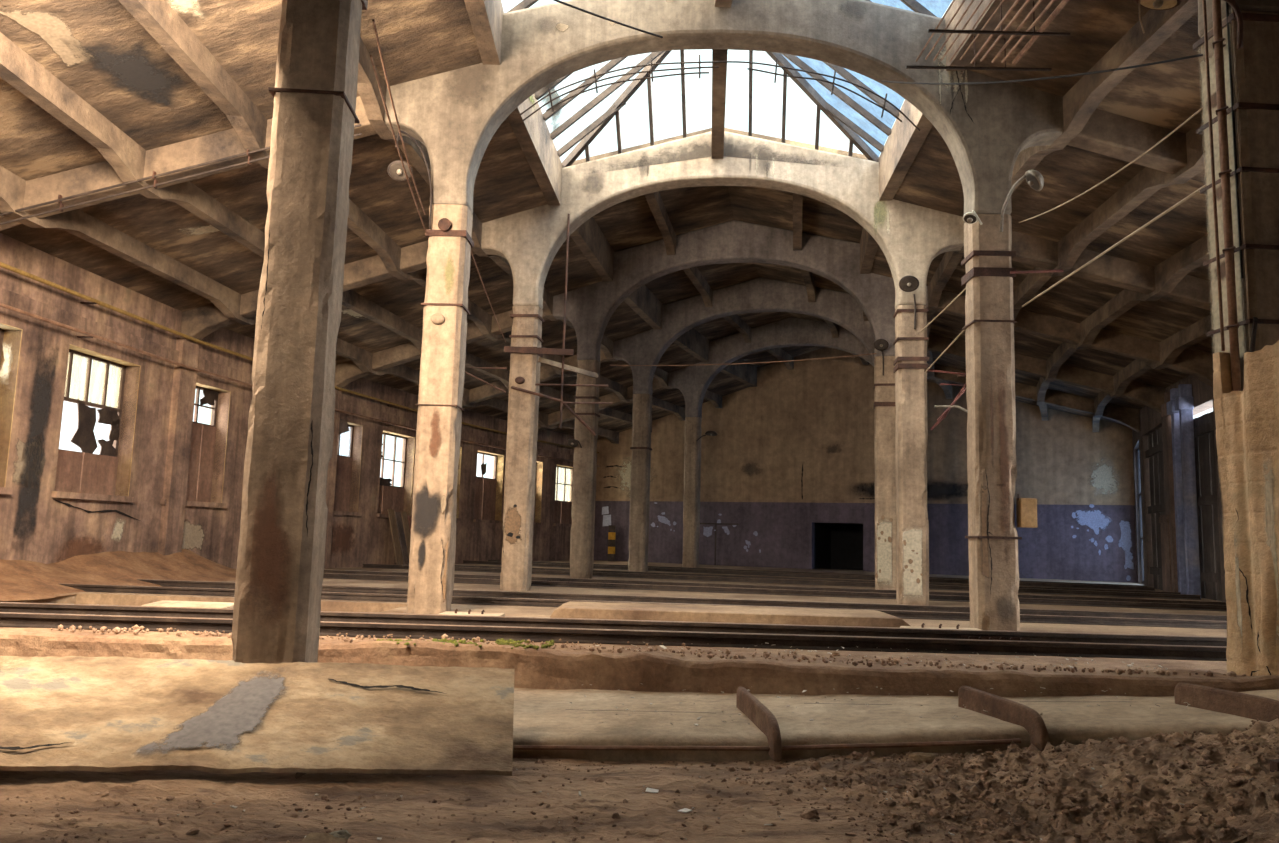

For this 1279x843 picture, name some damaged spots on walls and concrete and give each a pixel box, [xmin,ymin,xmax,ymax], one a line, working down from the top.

leakage [13,358,56,538]
peeling [1071,504,1134,581]
crack [1237,566,1271,676]
crack [0,742,71,750]
peeling [137,671,285,753]
crack [329,679,447,694]